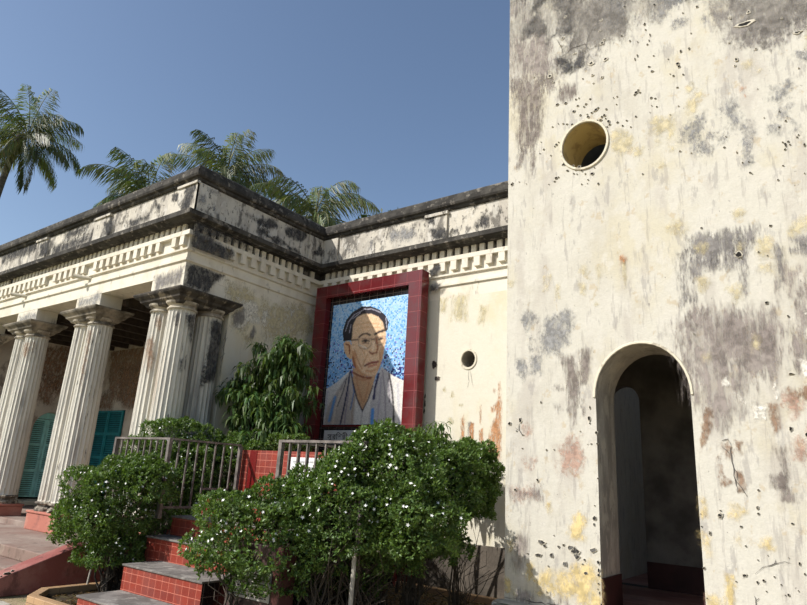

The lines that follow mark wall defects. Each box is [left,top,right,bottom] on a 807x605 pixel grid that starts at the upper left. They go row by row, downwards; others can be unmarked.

leakage [702,0,807,48]
leakage [509,0,636,168]
leakage [104,201,160,234]
leakage [172,185,212,209]
leakage [191,222,252,260]
leakage [254,218,307,254]
leakage [428,214,458,240]
leakage [155,265,225,292]
leakage [678,226,781,430]
leakage [201,320,222,386]
corrosion [461,387,502,457]
crack [722,439,748,497]